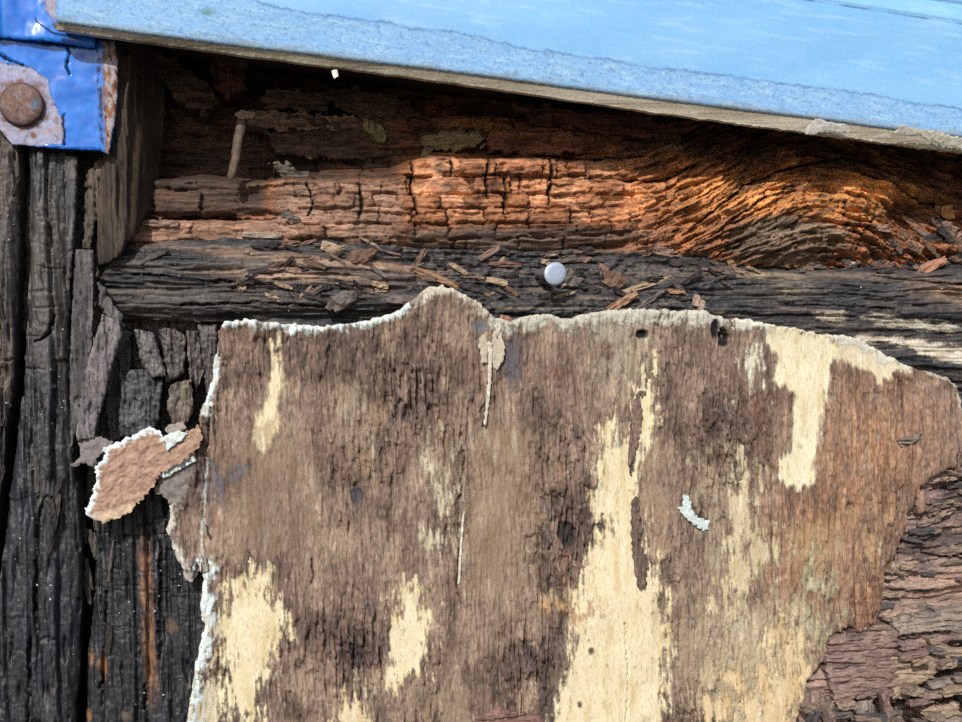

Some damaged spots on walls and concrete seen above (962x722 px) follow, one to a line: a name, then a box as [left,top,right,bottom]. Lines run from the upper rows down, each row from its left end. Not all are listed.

crack [356,186,364,218]
crack [409,161,417,215]
crack [484,158,507,215]
peeling [252,331,285,453]
peeling [341,387,389,491]
crack [33,505,42,613]
peeling [418,419,468,571]
peeling [539,321,912,722]
peeling [896,462,962,549]
crack [25,641,33,722]
peeling [187,557,298,722]
peeling [327,572,443,722]